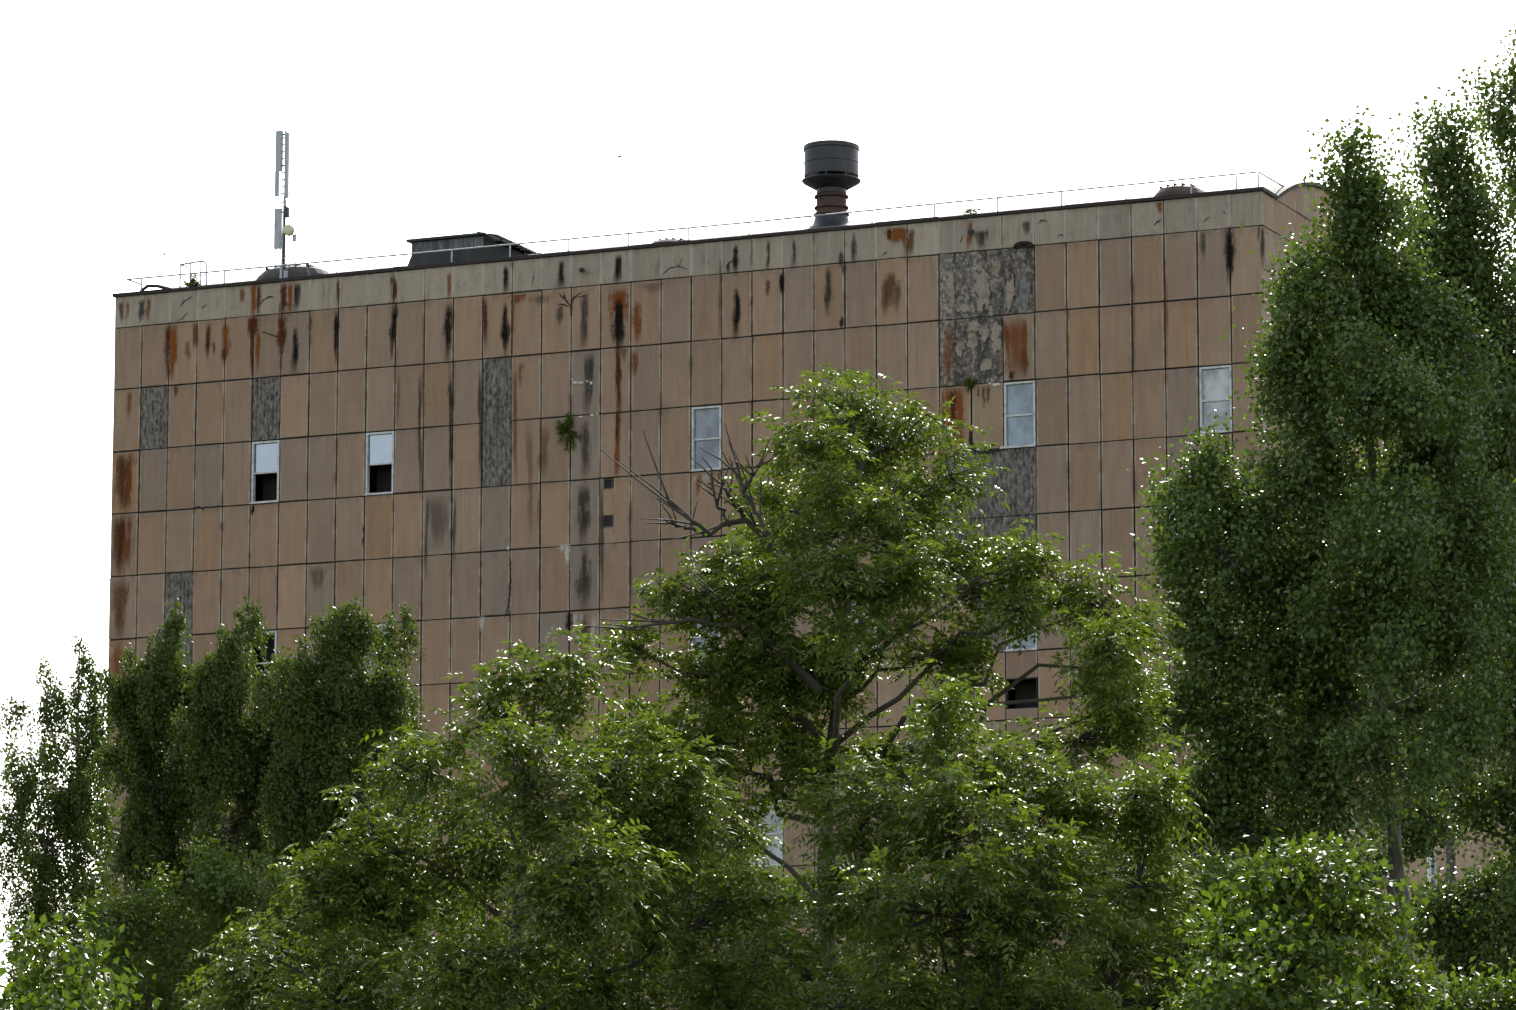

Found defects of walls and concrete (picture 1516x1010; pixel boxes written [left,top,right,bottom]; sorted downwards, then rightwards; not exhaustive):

rust [884,228,907,244]
rust [164,324,231,395]
rust [240,285,292,369]
rust [608,292,641,469]
rust [882,276,895,304]
spalling [940,246,1035,386]
rust [117,460,131,499]